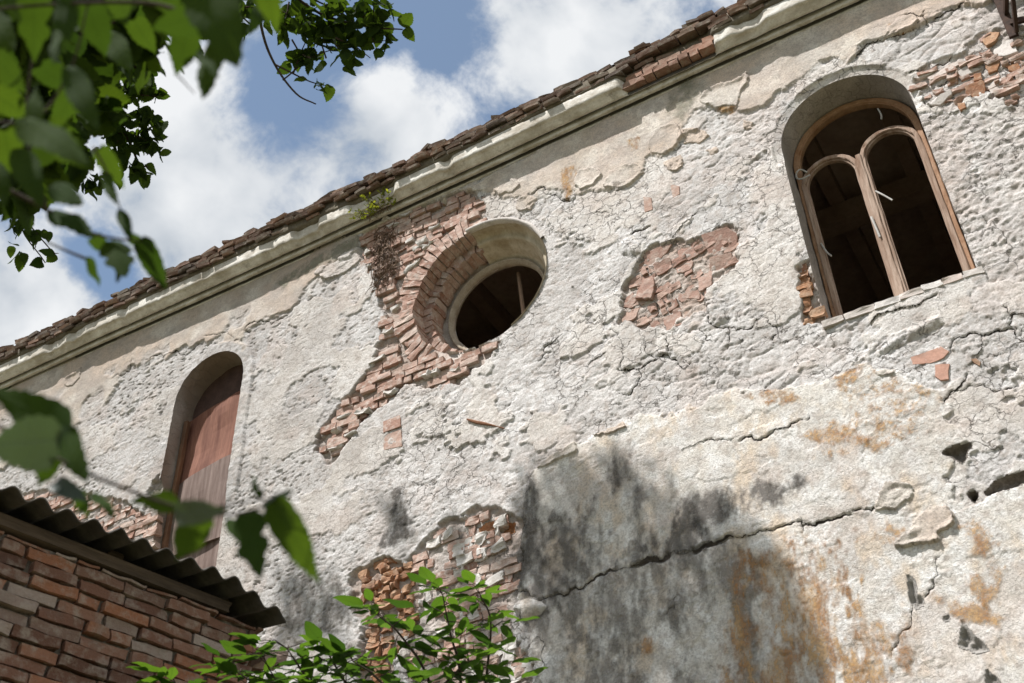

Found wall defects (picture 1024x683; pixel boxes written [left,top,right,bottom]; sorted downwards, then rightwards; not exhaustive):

flaking render [699,71,749,110]
flaking render [908,32,1024,112]
flaking render [314,178,538,457]
crack [591,329,691,396]
crack [699,317,778,343]
crack [944,307,1024,403]
flaking render [23,491,163,550]
flaking render [358,510,533,683]
leakage [510,454,805,683]
crack [521,507,875,600]
spalling [942,442,972,463]
spalling [967,471,1024,502]